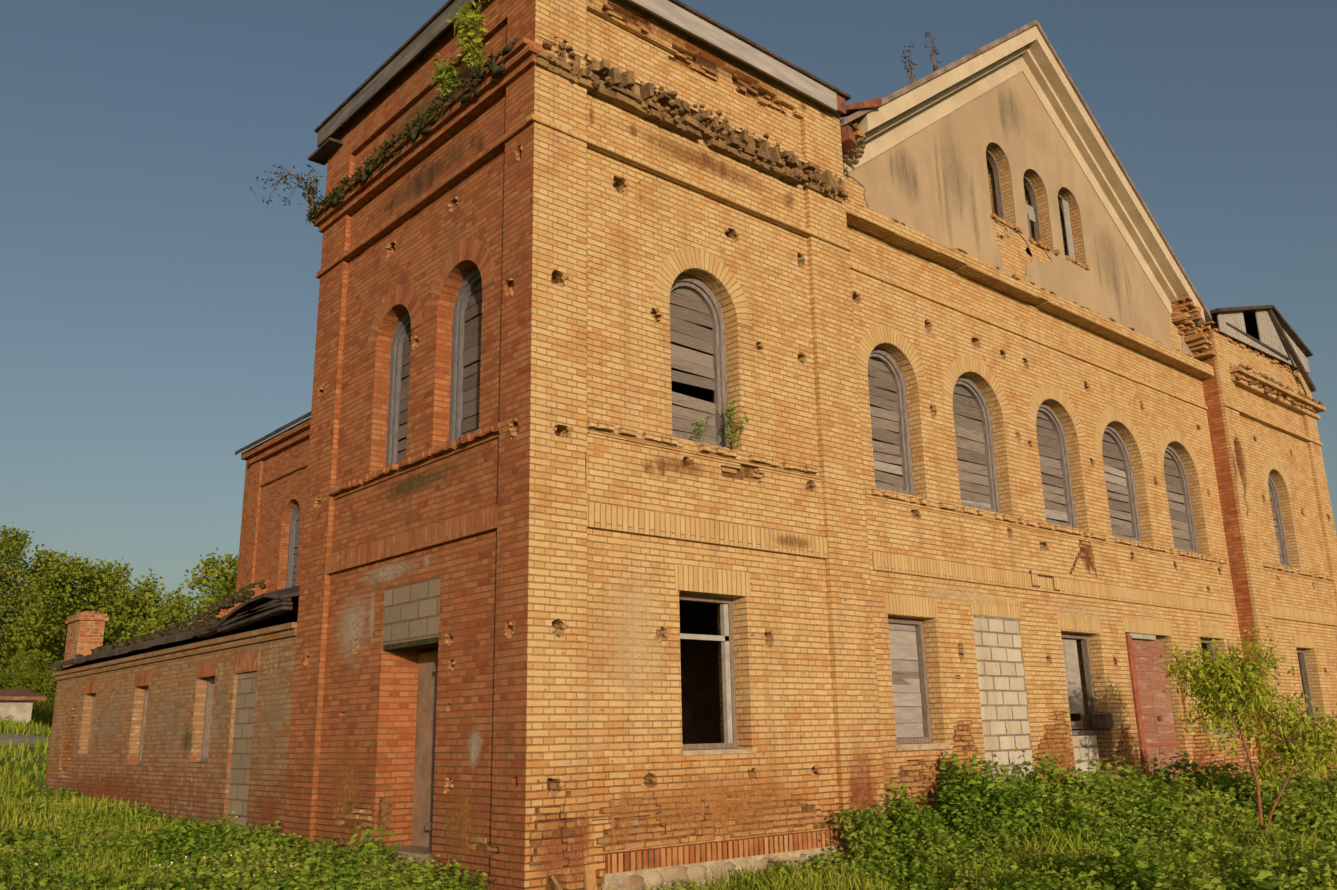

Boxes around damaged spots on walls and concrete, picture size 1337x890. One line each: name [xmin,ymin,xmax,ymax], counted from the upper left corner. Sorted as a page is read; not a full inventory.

spalling [601,4,656,46]
spalling [557,50,871,208]
peeling [992,220,1052,282]
spalling [1169,295,1217,360]
spalling [721,467,762,483]
spalling [848,720,979,844]
spalling [1034,711,1074,782]
spalling [529,778,832,890]